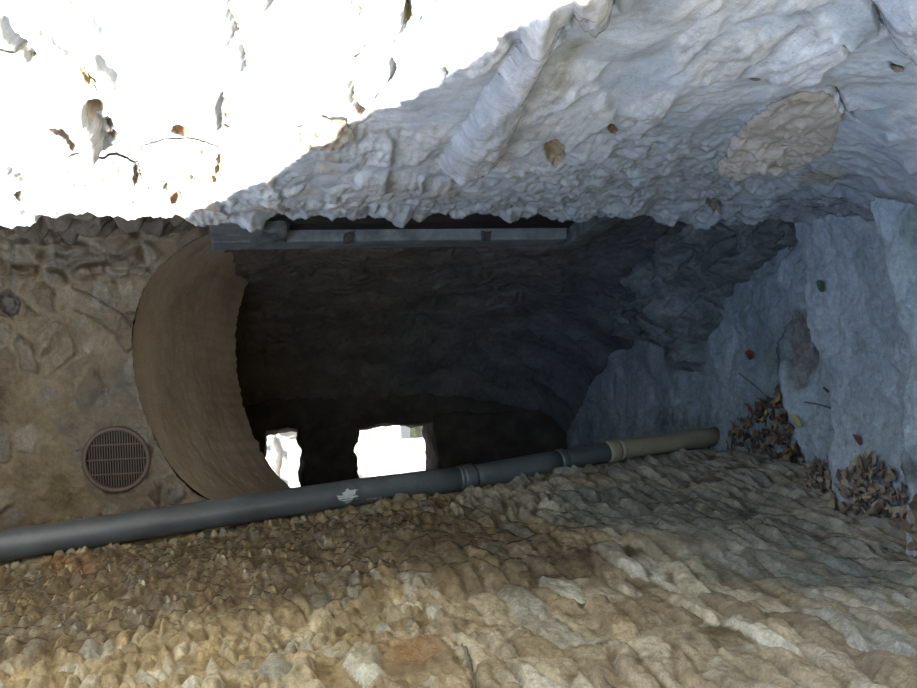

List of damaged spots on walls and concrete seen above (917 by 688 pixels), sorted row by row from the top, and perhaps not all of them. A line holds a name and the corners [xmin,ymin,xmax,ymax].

spalling [0,41,38,136]
spalling [48,124,223,204]
spalling [277,117,354,157]
spalling [716,91,846,181]